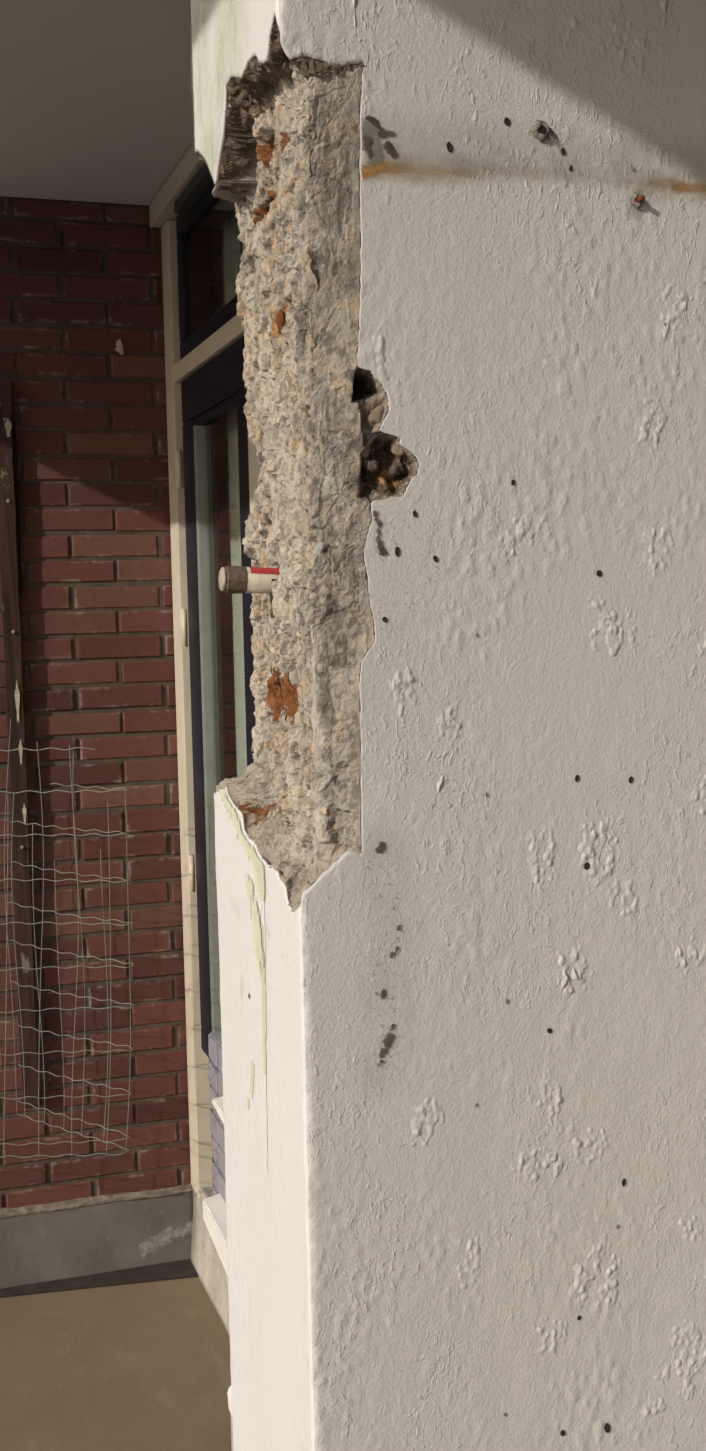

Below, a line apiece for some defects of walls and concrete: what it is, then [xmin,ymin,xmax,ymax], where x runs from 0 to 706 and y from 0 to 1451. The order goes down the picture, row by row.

rust [256,132,290,167]
rust [252,190,277,226]
spalling [196,16,419,1110]
rust [259,666,299,726]